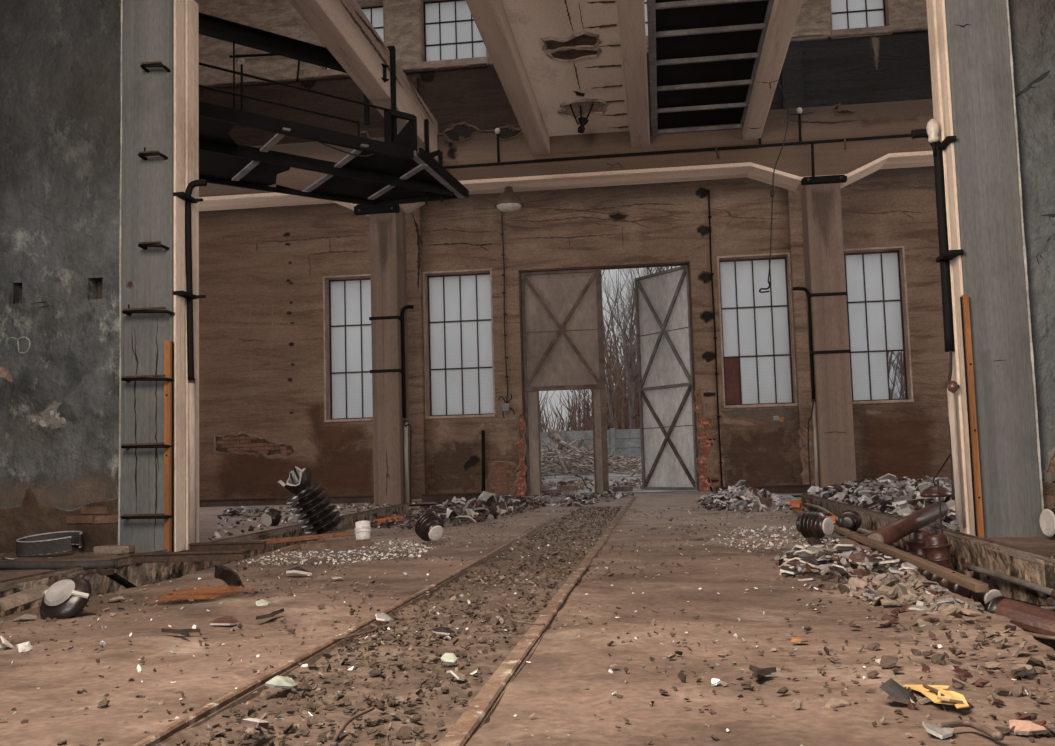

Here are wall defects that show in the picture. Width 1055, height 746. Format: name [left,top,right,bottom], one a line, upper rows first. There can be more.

spalling [541,31,602,62]
spalling [558,91,609,119]
crack [132,317,159,542]
spalling [213,431,298,459]
spalling [462,413,528,496]
spalling [693,387,726,492]
spalling [1041,447,1055,509]